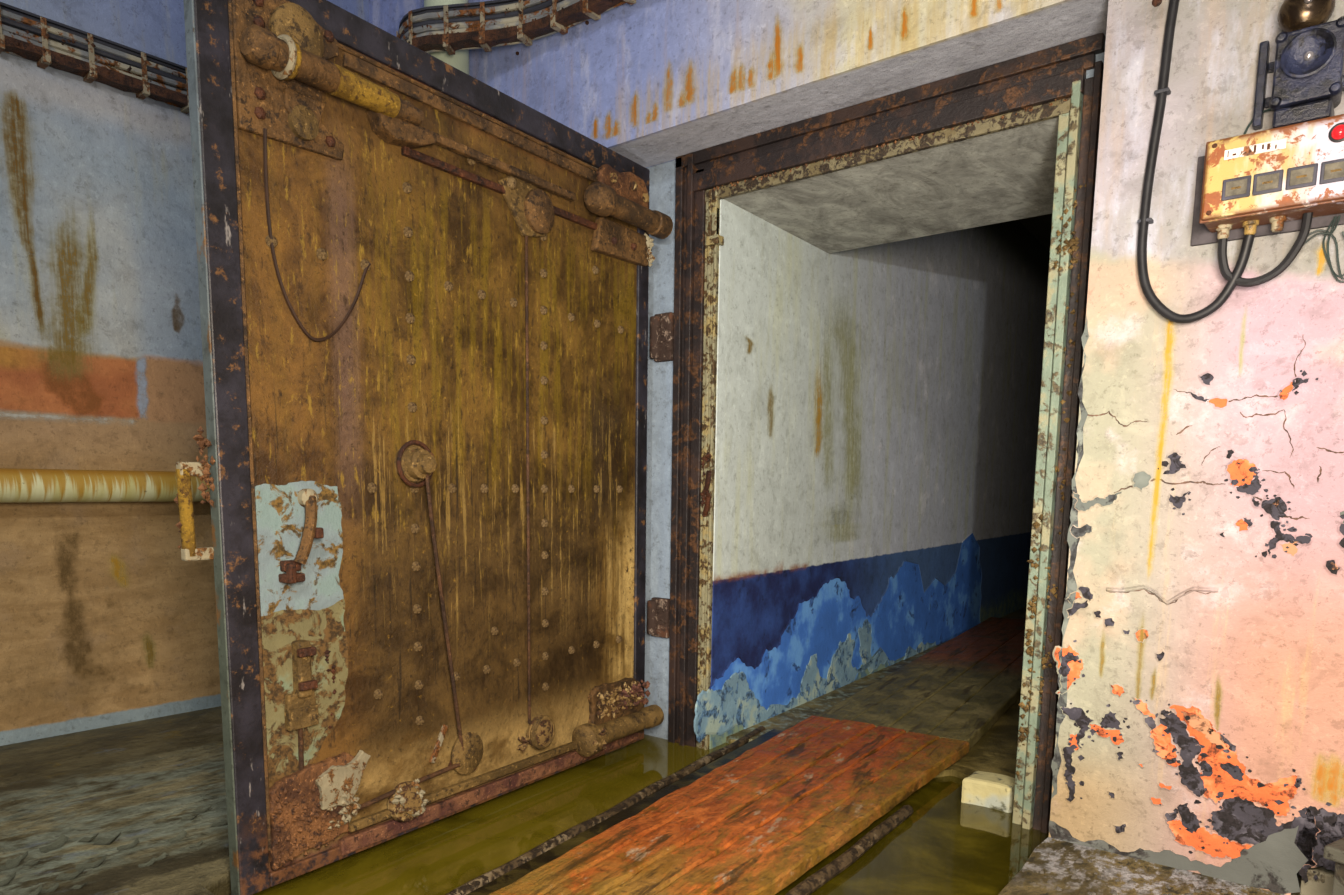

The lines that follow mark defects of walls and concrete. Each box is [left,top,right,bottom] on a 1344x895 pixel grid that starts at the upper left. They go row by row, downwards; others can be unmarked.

corrosion [593,65,695,139]
corrosion [729,22,803,93]
corrosion [2,93,44,330]
corrosion [1053,184,1086,368]
crack [1087,411,1147,427]
crack [1082,447,1223,502]
crack [1175,339,1344,520]
corrosion [1016,514,1061,776]
crack [1106,585,1219,605]
peeling [1049,317,1344,894]